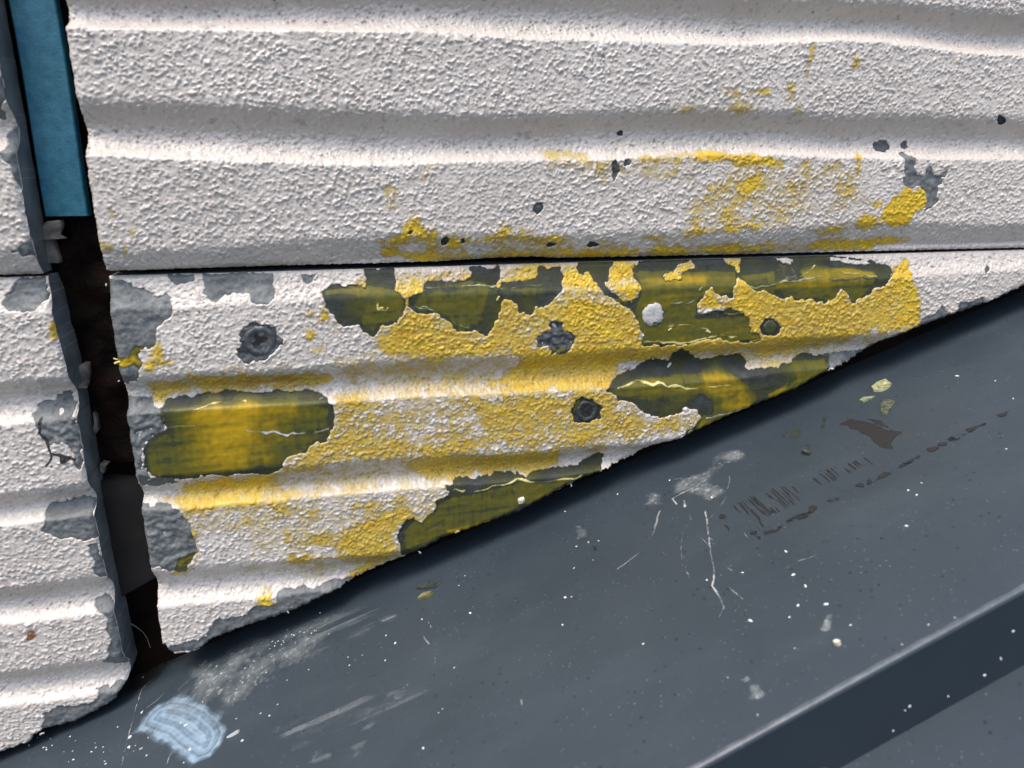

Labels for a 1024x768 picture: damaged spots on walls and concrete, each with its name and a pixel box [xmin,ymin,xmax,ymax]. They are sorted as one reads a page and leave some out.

peeling [873,140,947,211]
peeling [2,276,50,313]
peeling [167,272,275,305]
peeling [321,265,564,337]
peeling [537,321,575,355]
peeling [576,255,984,435]
peeling [105,279,335,486]
peeling [32,390,84,470]
peeling [41,495,107,577]
peeling [142,502,198,572]
peeling [397,452,604,555]
peeling [95,593,129,663]